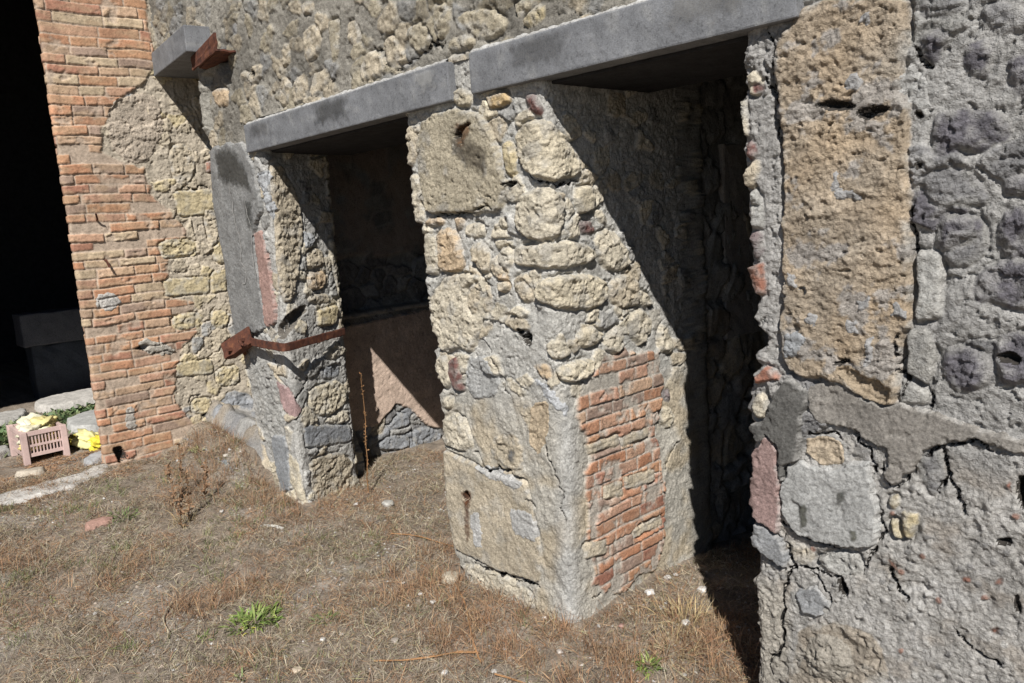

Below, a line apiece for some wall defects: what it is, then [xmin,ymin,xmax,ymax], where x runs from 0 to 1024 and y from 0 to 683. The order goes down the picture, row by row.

crack [475,562,540,587]
crack [769,431,994,683]
crack [953,626,1007,666]